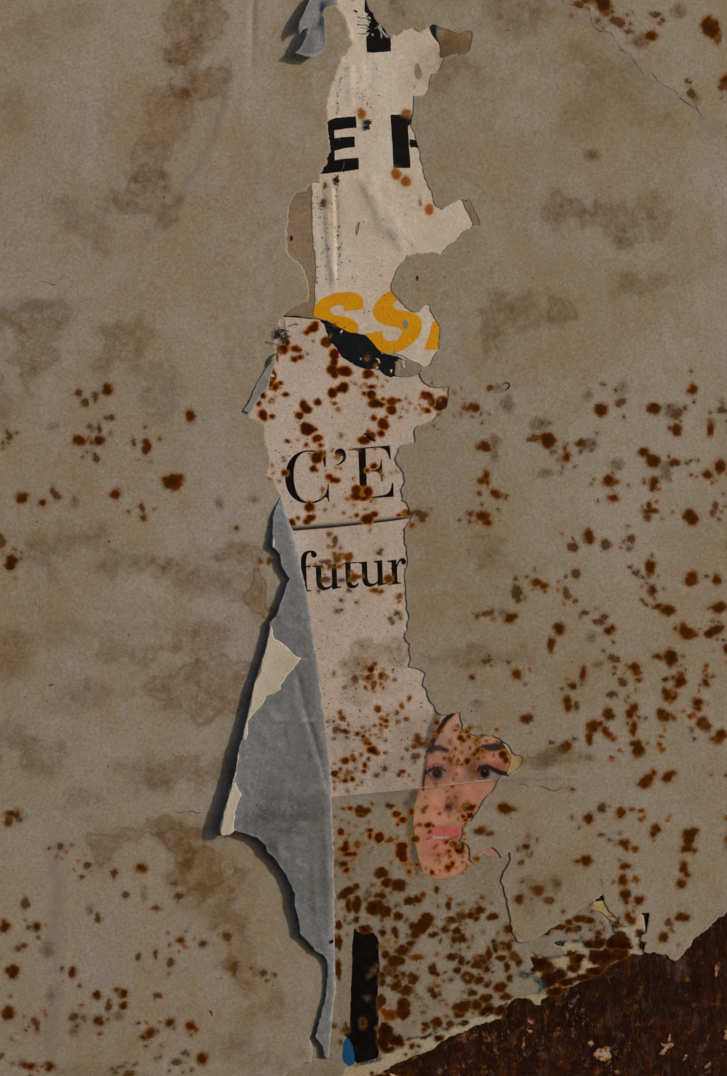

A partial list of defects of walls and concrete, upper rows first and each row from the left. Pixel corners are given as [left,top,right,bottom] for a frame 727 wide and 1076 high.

peeling [295,0,339,57]
peeling [435,26,472,58]
corrosion [571,0,681,46]
crack [562,1,727,127]
peeling [283,182,323,319]
corrosion [256,320,491,532]
corrosion [638,447,727,526]
corrosion [472,554,727,762]
peeling [219,496,336,1058]
corrosion [326,695,677,1059]
corrosion [676,827,700,889]
peeling [587,1040,622,1074]